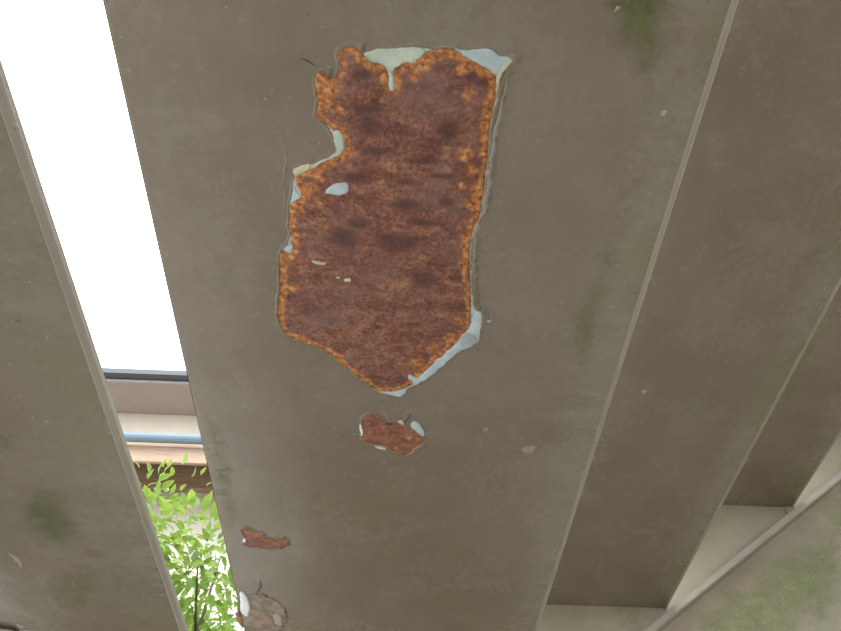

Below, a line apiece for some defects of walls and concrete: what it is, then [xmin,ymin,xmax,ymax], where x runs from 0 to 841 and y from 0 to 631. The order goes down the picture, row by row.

corrosion [274,40,522,398]
corrosion [358,411,426,457]
corrosion [239,526,291,550]
peeling [235,580,288,631]